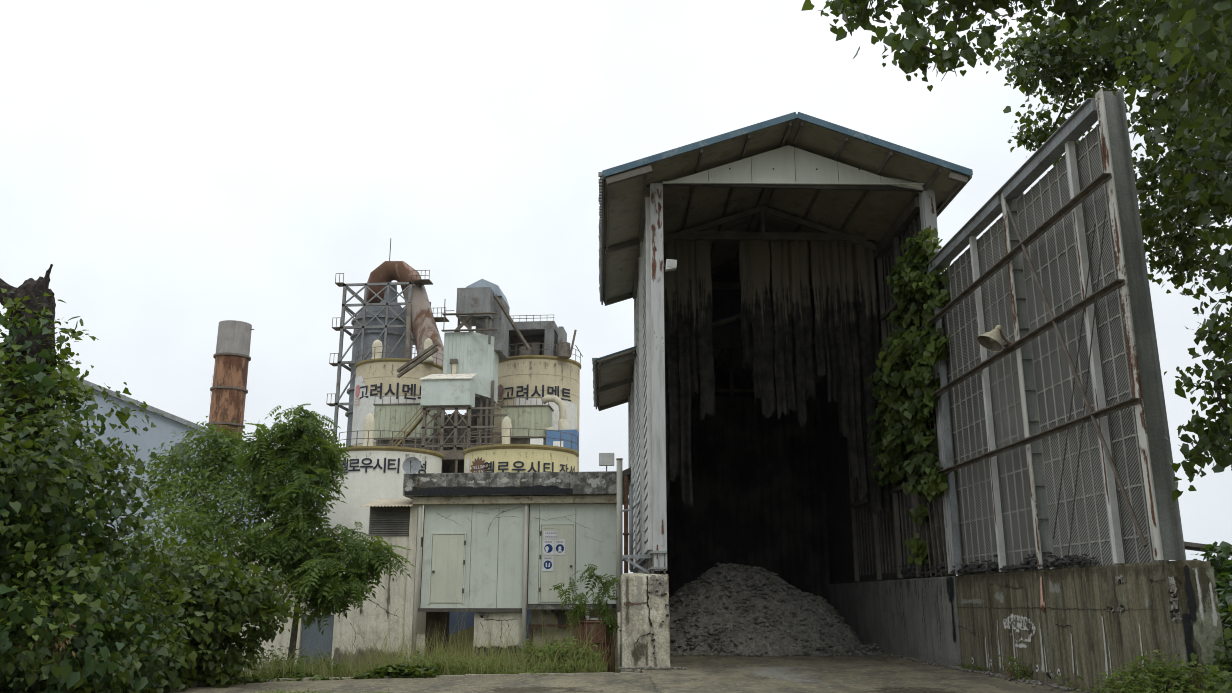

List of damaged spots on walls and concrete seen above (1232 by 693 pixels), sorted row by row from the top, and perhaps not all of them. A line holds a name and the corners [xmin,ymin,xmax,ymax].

rust [651,189,663,281]
rust [1126,334,1135,398]
rust [1140,447,1156,525]
crack [620,576,655,649]
water stain [886,563,1163,678]
water stain [1182,565,1200,685]